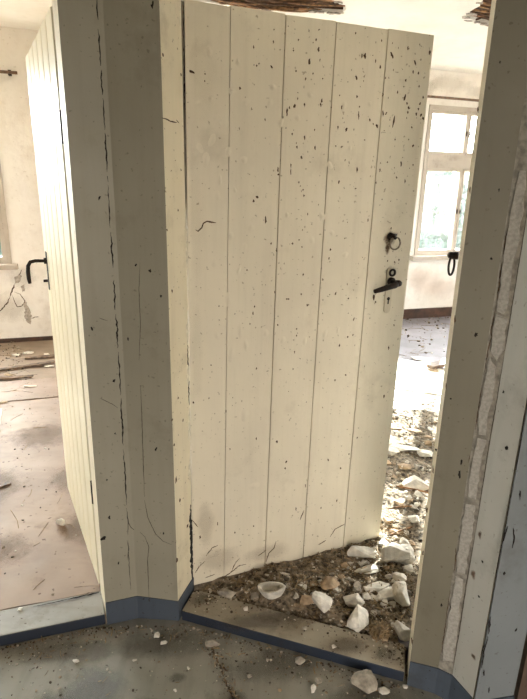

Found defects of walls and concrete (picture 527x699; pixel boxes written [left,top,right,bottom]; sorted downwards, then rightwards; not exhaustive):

crack [180,2,188,105]
crack [96,4,114,264]
flaking render [23,302,32,324]
crack [100,271,172,590]
crack [187,505,195,578]